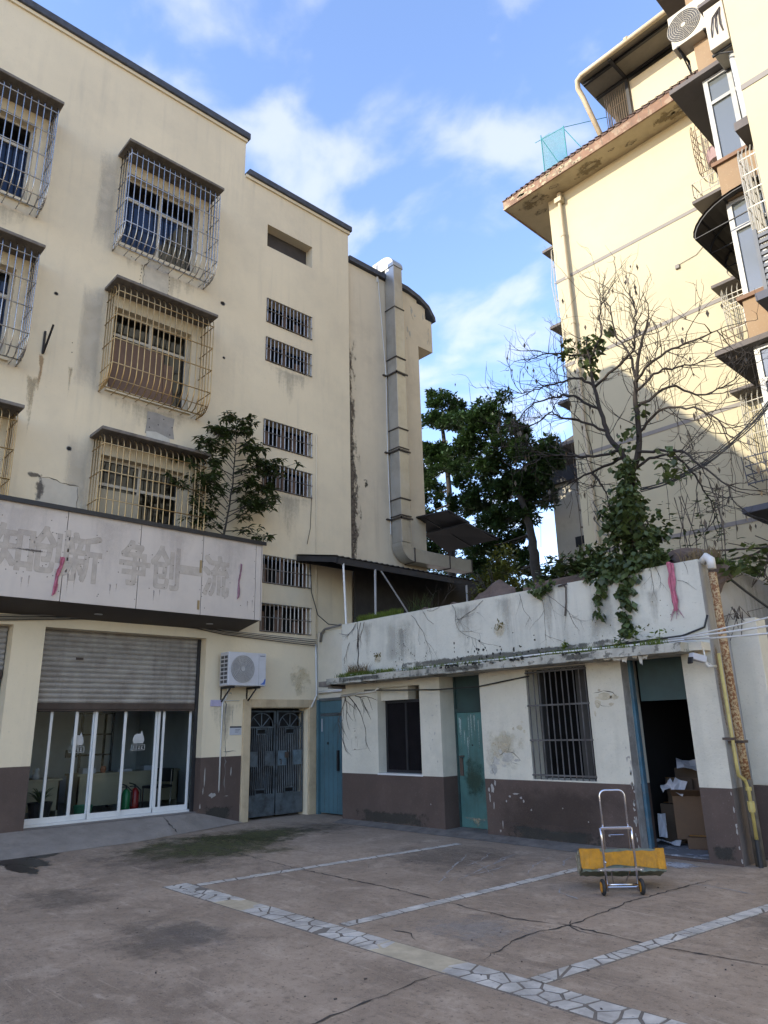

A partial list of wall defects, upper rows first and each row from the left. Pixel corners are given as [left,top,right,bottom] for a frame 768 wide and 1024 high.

damp [350,403,361,558]
damp [392,622,611,672]
peeling [488,749,532,811]
damp [0,853,60,874]